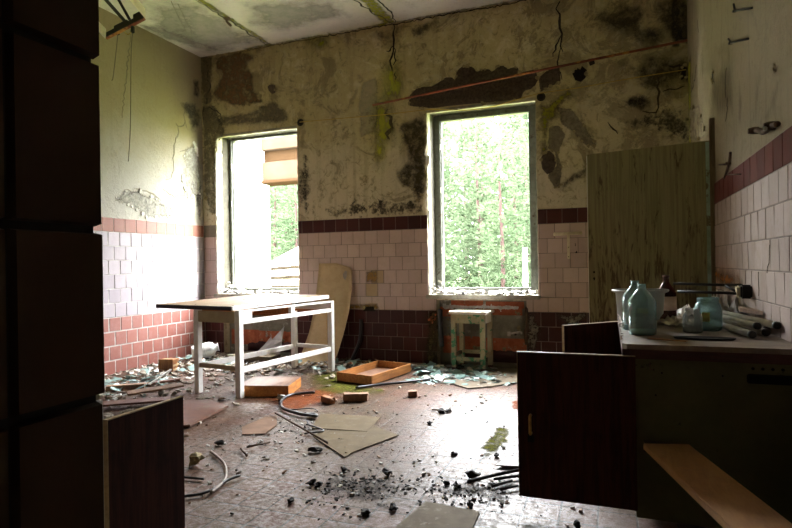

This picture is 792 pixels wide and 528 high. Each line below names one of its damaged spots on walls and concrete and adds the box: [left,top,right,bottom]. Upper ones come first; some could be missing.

leakage [145,6,257,49]
leakage [253,4,338,28]
crack [196,0,526,84]
crack [552,1,563,79]
spalling [408,63,561,108]
mould [184,104,200,127]
mould [626,96,689,140]
flaking render [182,52,277,292]
flaking render [115,188,179,219]
mould [328,200,421,216]